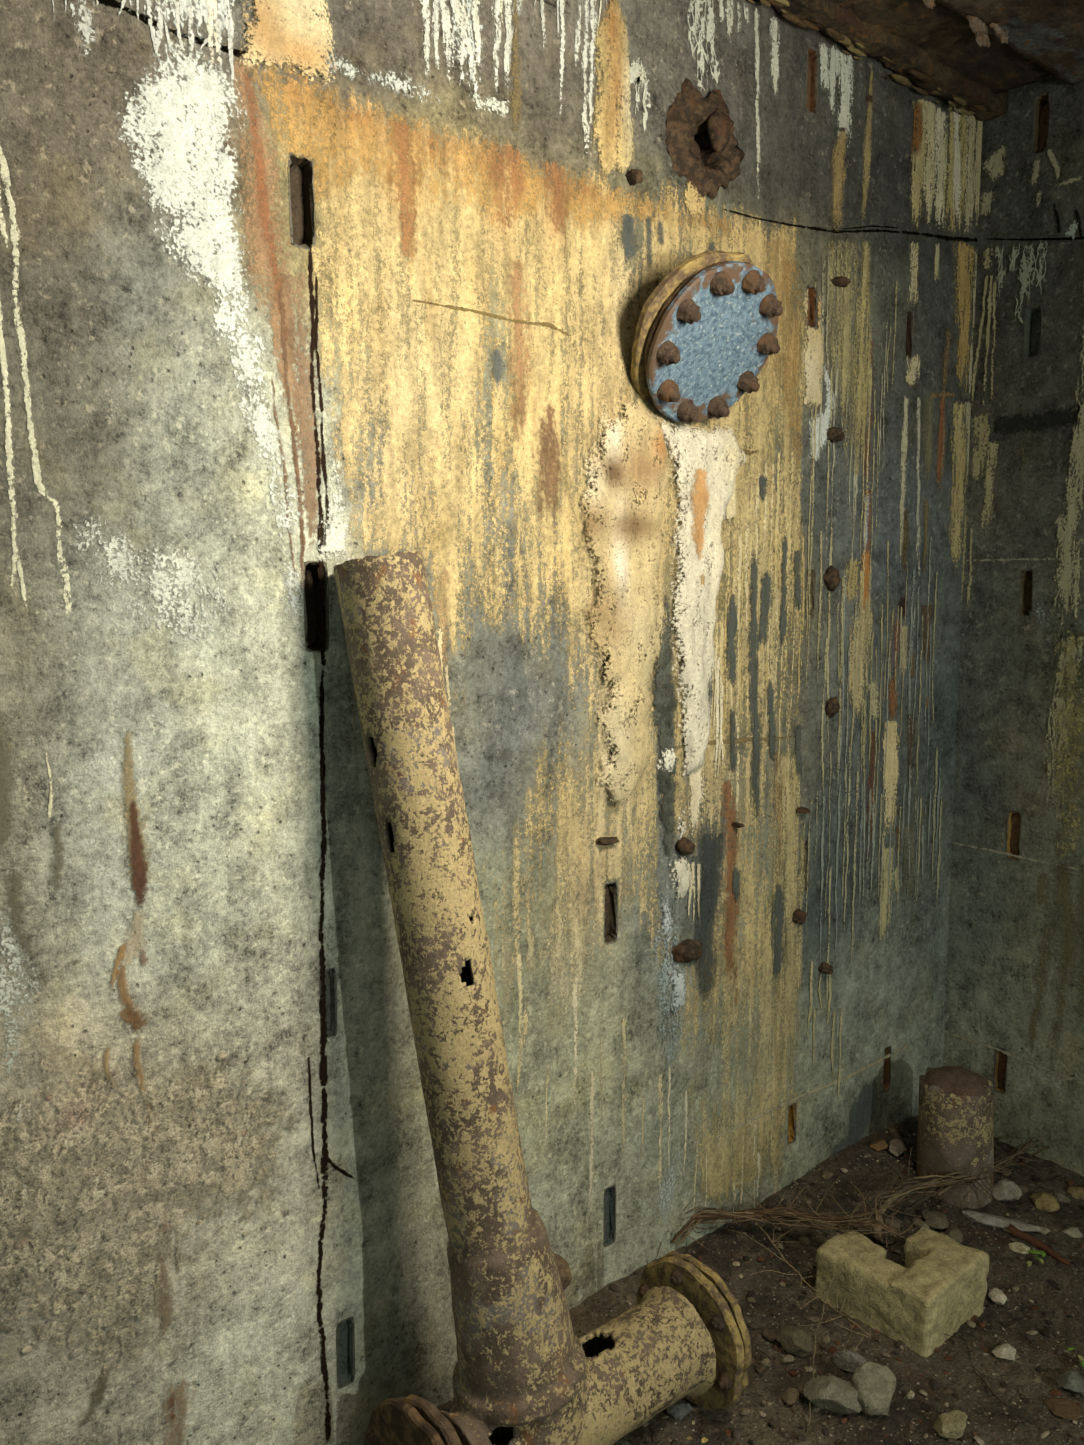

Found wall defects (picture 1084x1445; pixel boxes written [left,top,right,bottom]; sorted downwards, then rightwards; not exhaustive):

water stain [52,0,99,54]
crack [97,0,250,59]
corrosion [593,0,651,174]
corrosion [665,78,745,200]
corrosion [831,127,846,229]
crack [724,204,1084,242]
water stain [0,146,232,648]
corrosion [226,61,321,595]
water stain [118,0,1048,1231]
water stain [1030,319,1084,1057]
crack [308,245,354,1442]
water stain [0,874,39,1072]